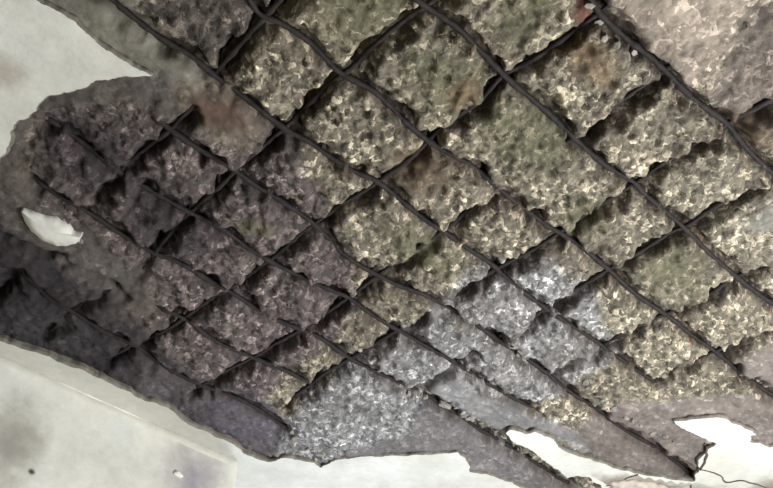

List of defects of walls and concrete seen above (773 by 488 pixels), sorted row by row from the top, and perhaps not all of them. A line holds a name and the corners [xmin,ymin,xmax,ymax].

spalling [0,0,773,383]
spalling [0,223,773,488]
crack [690,444,767,488]